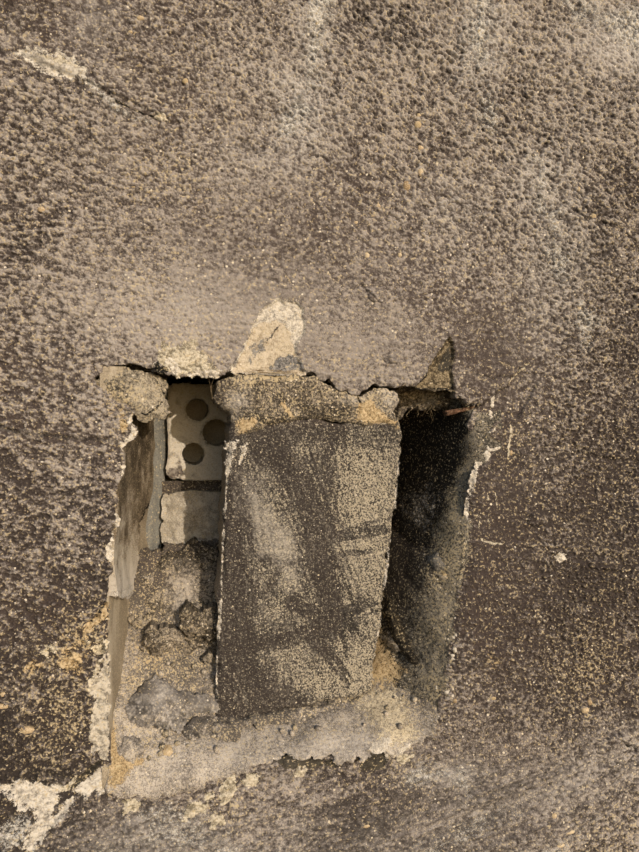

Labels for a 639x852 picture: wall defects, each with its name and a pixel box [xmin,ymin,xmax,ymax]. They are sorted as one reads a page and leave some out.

crack [111,96,154,117]
flaking render [157,298,307,379]
flaking render [414,338,455,392]
crack [415,337,530,407]
flaking render [103,414,154,599]
flaking render [464,445,501,520]
spalling [160,439,248,639]
flaking render [277,755,337,778]
flaking render [359,736,415,772]
flaking render [121,798,141,816]
flaking render [181,773,260,830]